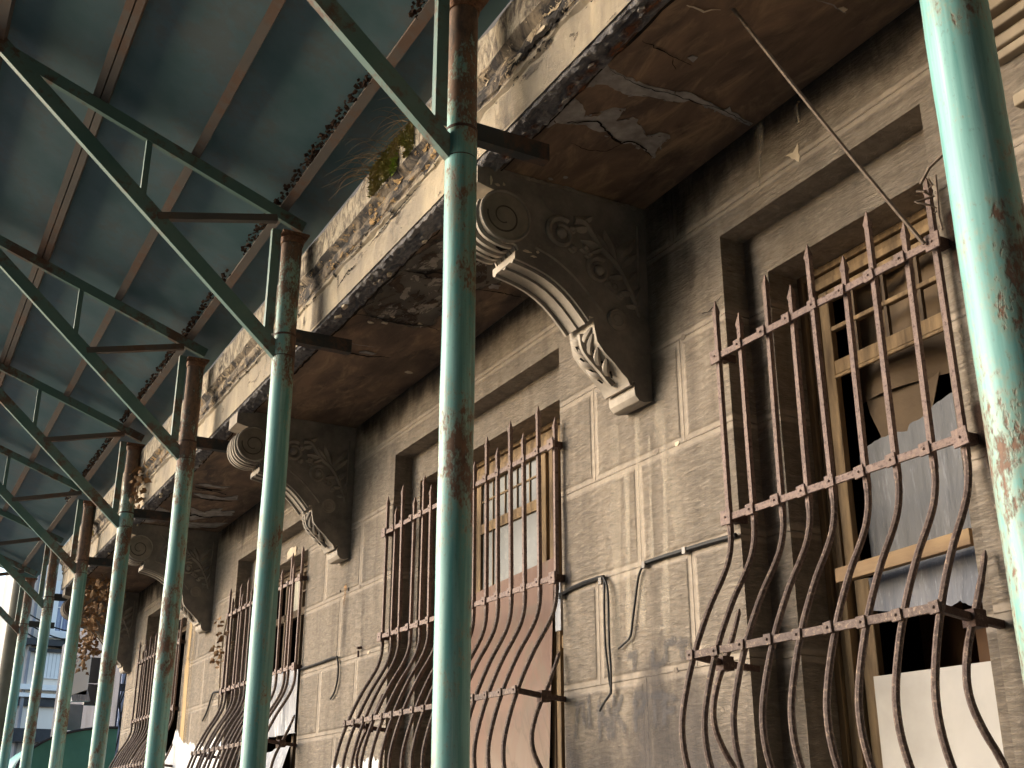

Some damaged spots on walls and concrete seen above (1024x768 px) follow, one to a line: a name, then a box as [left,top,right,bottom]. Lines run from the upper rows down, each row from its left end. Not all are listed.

spalling [477,0,592,104]
spalling [505,0,753,158]
spalling [477,150,515,186]
rust [946,210,960,271]
spalling [294,346,318,374]
spalling [188,344,271,529]
rust [972,402,990,468]
spalling [133,473,175,526]